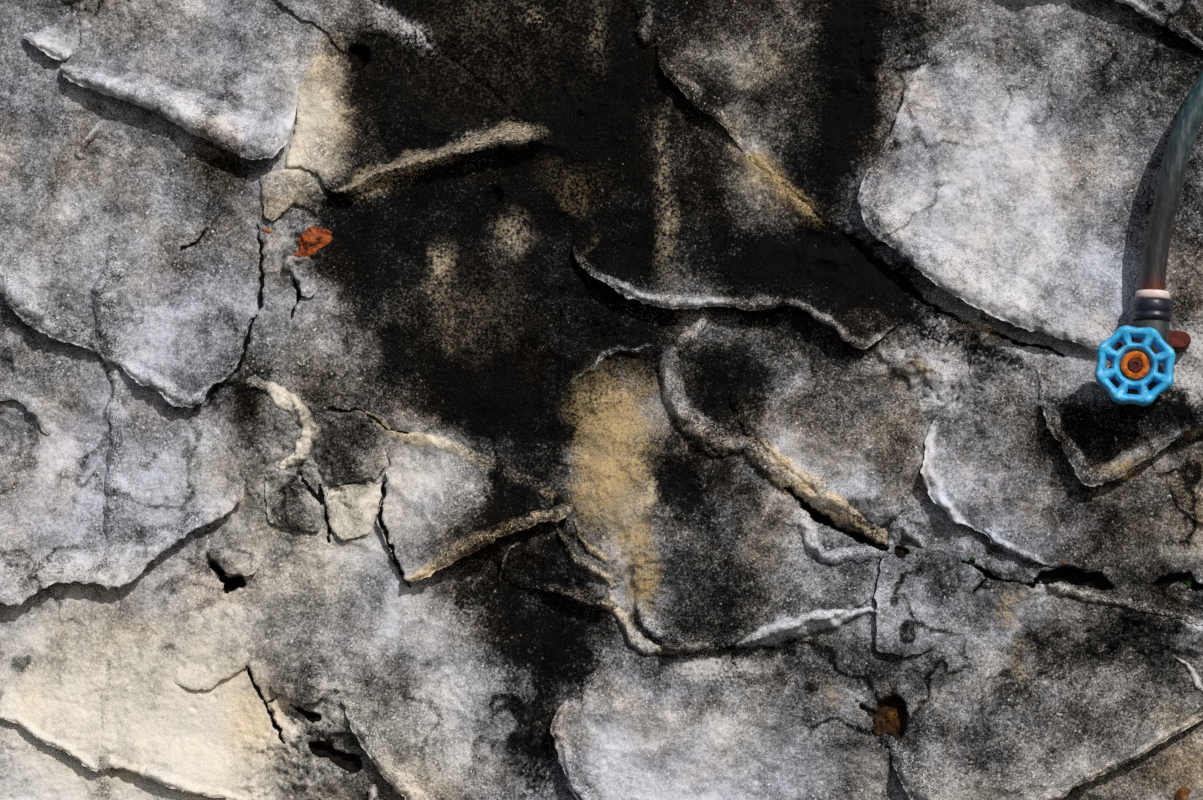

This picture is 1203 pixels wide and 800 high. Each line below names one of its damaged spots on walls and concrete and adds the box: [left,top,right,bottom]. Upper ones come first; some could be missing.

crack [180,227,209,250]
flaking render [0,0,546,606]
water stain [347,0,1031,615]
crack [246,665,286,744]
crack [377,481,411,587]
water stain [451,570,597,797]
water stain [671,652,764,684]
flaking render [729,347,1203,570]
flaking render [812,608,1203,800]
water stain [995,591,1024,628]